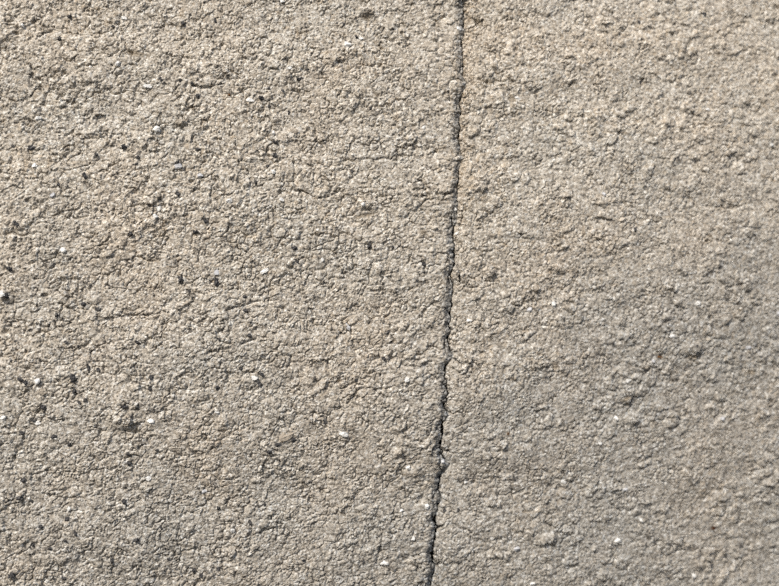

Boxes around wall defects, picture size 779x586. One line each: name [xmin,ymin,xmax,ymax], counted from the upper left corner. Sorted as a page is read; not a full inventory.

crack [458,3,469,150]
crack [430,169,465,586]